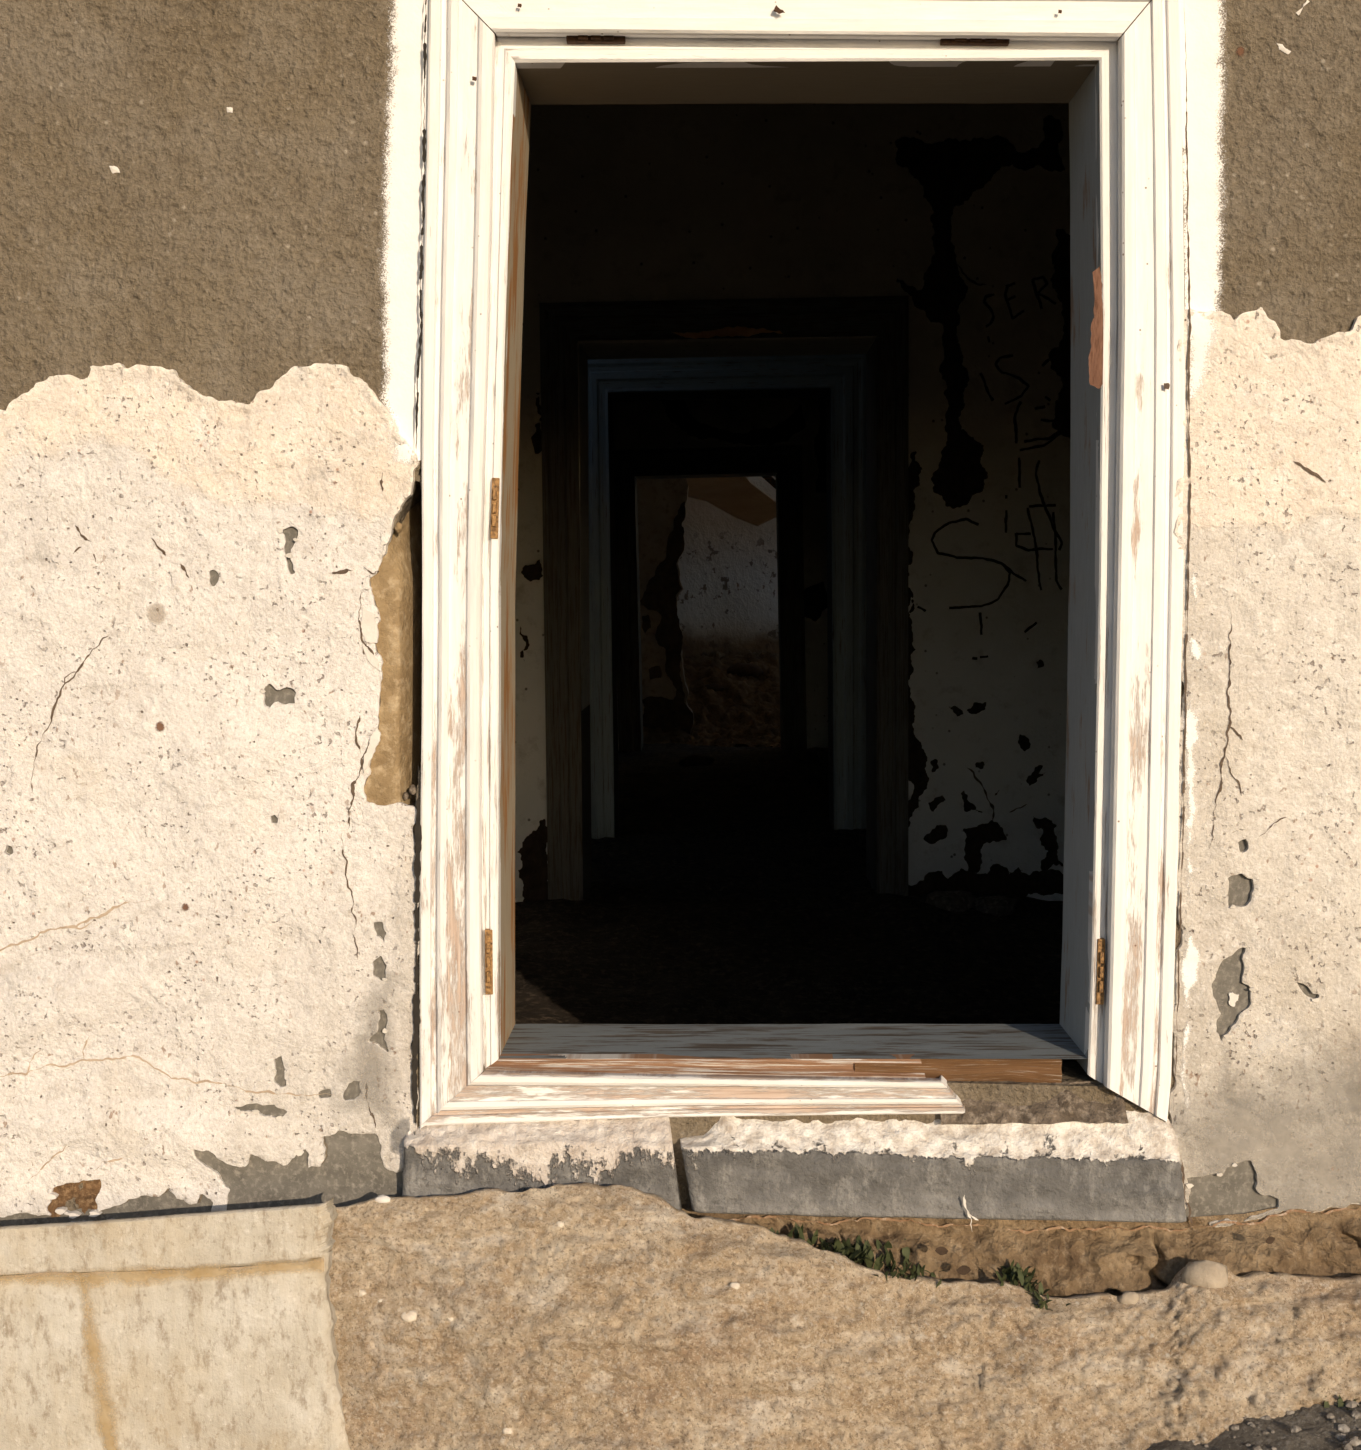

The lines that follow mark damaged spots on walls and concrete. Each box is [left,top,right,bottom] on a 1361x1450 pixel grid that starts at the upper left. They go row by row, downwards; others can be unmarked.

peeling [277,527,299,574]
peeling [895,115,1065,897]
crack [1174,14,1243,1085]
crack [31,636,108,792]
peeling [260,684,296,707]
spalling [361,501,422,806]
peeling [1228,874,1252,908]
peeling [373,922,387,981]
peeling [1212,948,1255,1039]
peeling [235,1103,287,1121]
peeling [272,1056,286,1086]
peeling [0,1130,403,1226]